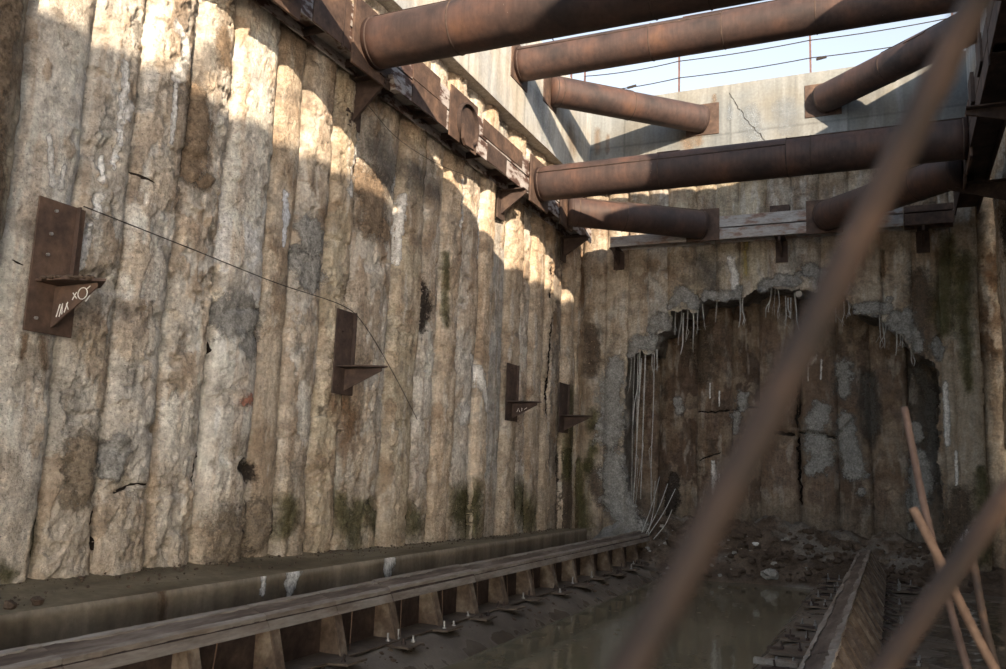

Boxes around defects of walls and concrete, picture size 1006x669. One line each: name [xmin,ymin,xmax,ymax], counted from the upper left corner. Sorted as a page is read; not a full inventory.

spalling [757,271,803,329]
spalling [835,296,925,365]
crack [113,483,147,494]
spalling [583,285,745,539]
crack [698,405,752,413]
spalling [729,389,750,435]
crack [779,391,837,504]
spalling [802,358,870,497]
spalling [905,421,935,530]
crack [87,511,95,550]